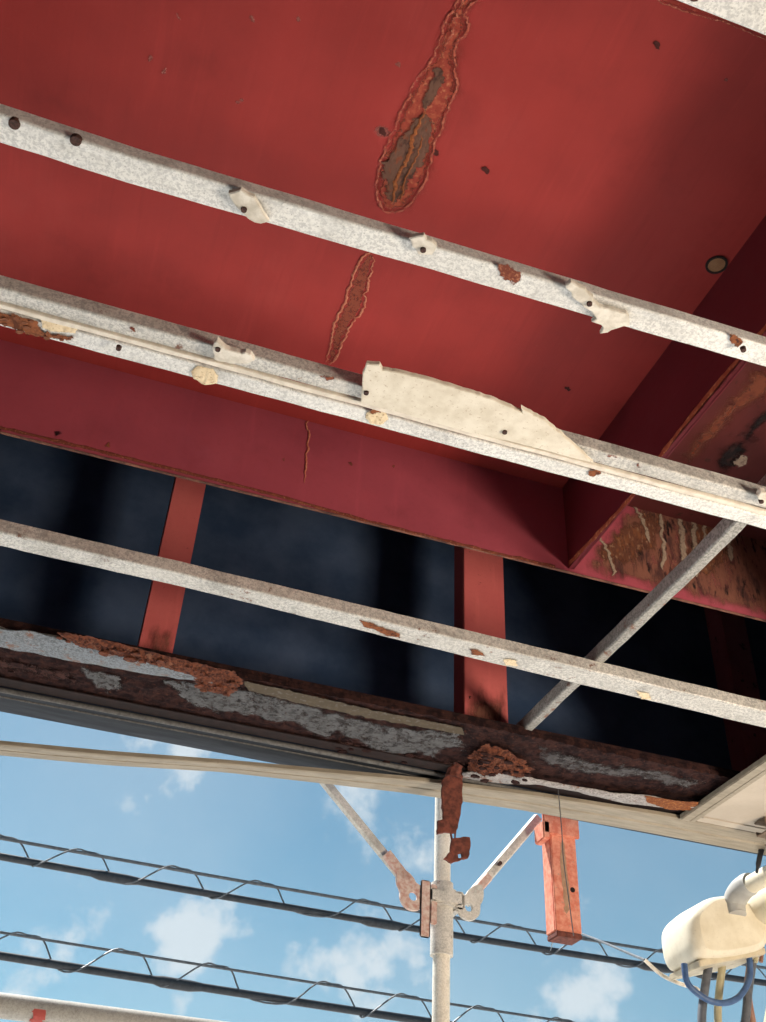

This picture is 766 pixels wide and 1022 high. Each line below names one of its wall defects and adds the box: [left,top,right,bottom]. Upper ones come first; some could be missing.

peeling [658,0,766,40]
peeling [375,0,476,214]
corrosion [0,312,73,341]
corrosion [658,334,743,457]
corrosion [56,632,244,697]
corrosion [335,740,544,864]